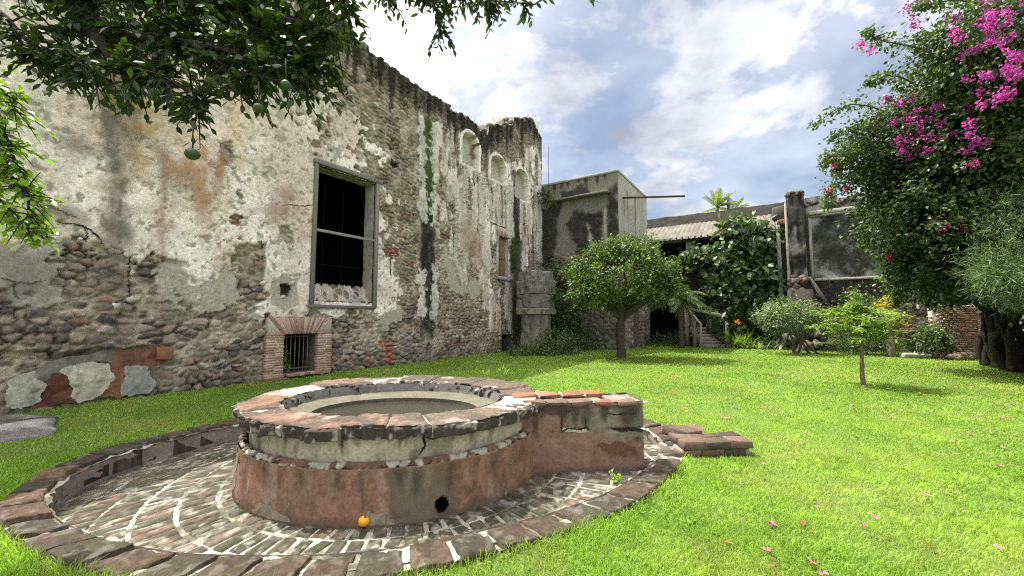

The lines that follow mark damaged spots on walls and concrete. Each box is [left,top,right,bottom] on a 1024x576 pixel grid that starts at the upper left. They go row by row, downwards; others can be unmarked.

leakage [99,75,146,238]
leakage [328,13,619,338]
crack [43,204,104,244]
flaking render [51,235,137,310]
crack [125,249,133,297]
flaking render [227,239,268,311]
flaking render [381,244,399,257]
peeling [30,346,174,408]
crack [419,435,436,455]